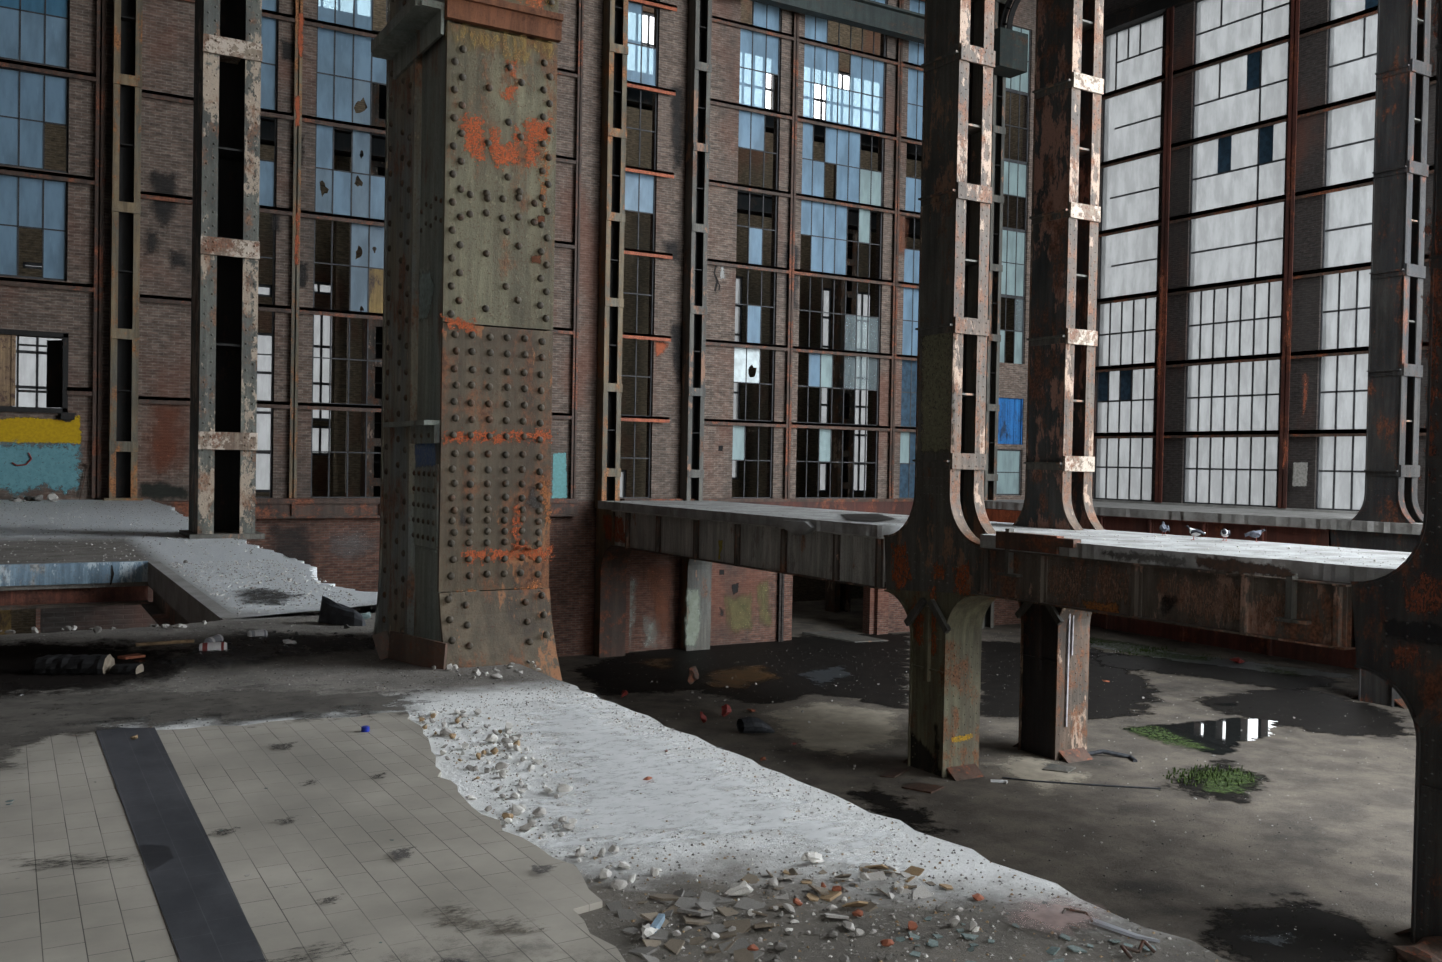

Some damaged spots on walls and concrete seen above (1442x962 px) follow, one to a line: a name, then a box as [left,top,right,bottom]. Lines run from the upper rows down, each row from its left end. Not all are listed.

peeling [0,413,83,496]
rust [537,475,554,530]
rust [910,724,941,777]
damp [1199,892,1391,962]